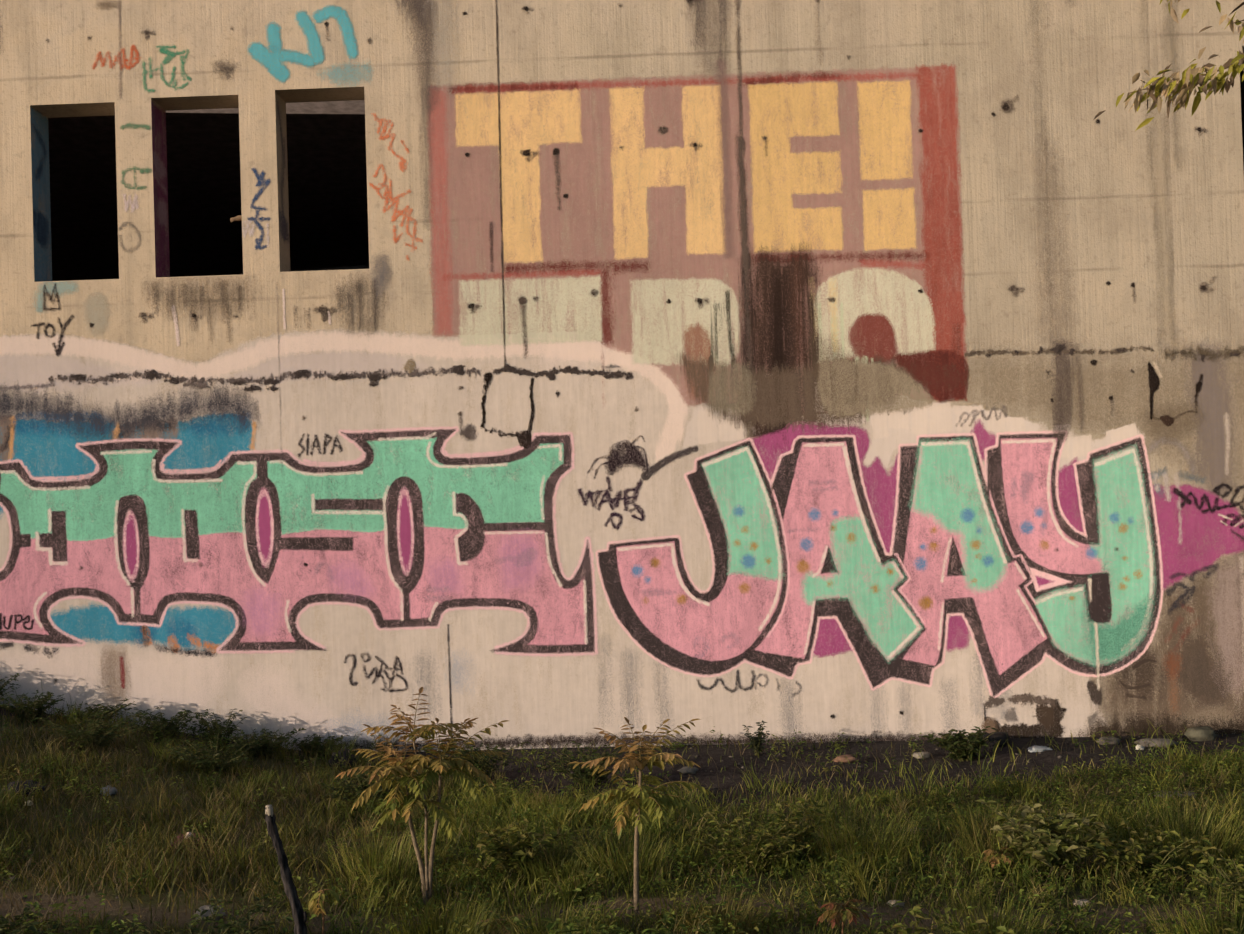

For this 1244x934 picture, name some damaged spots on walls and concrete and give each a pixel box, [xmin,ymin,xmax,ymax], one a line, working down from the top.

water stain [140,272,264,344]
water stain [329,250,393,339]
water stain [675,240,969,456]
water stain [1139,0,1242,500]
peeling [982,692,1064,739]